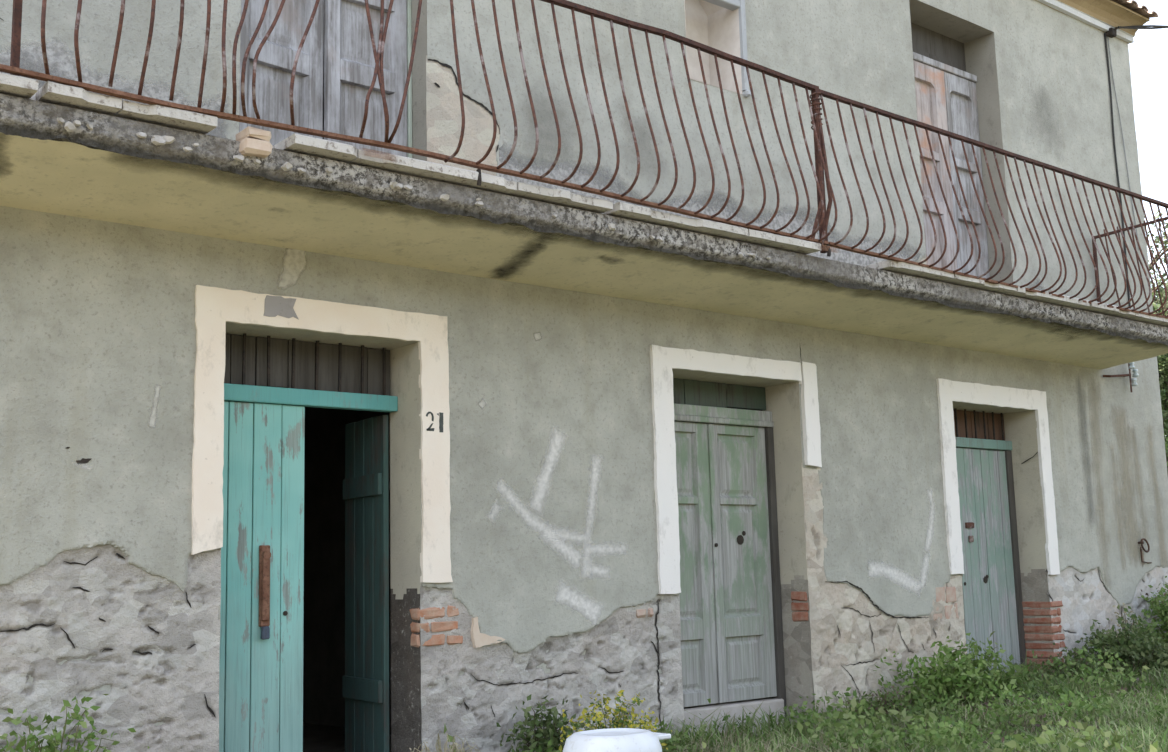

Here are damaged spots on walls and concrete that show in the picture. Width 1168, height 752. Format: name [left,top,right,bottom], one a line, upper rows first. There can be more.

peeling [426,55,500,176]
spalling [0,94,1168,345]
spalling [0,545,221,752]
spalling [410,585,686,752]
spalling [791,467,967,728]
spalling [1022,567,1168,680]